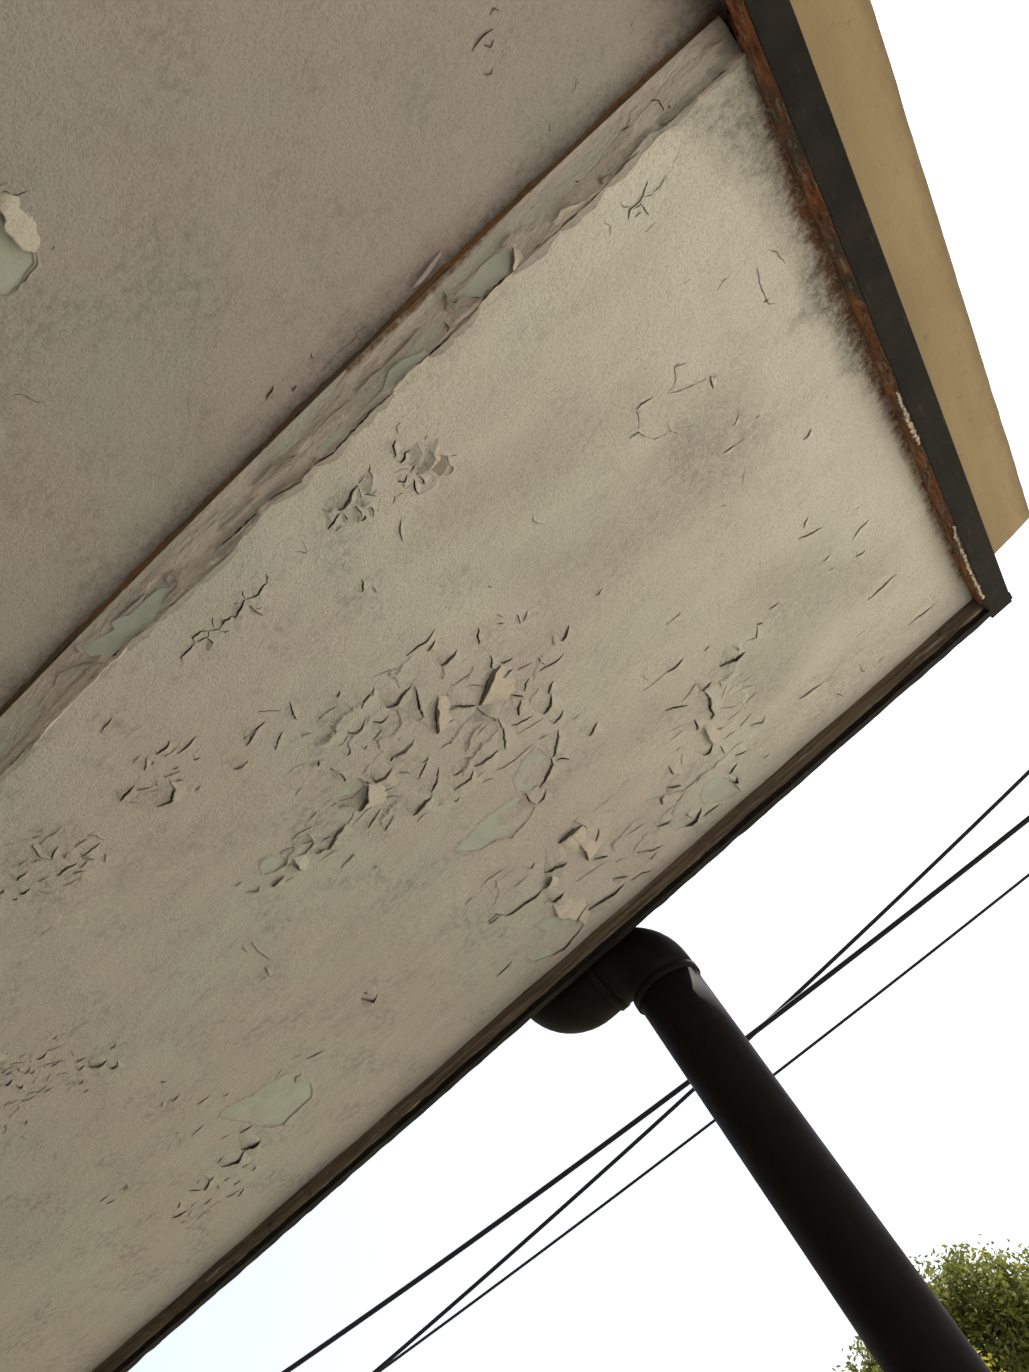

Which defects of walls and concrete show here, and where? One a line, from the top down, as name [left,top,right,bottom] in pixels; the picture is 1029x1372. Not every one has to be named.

peeling [0,184,54,301]
peeling [55,63,740,685]
crack [629,362,717,440]
crack [722,411,759,506]
corrosion [756,87,962,576]
peeling [234,610,603,894]
peeling [463,599,779,976]
peeling [0,827,109,903]
peeling [0,1035,127,1140]
peeling [172,1123,268,1224]